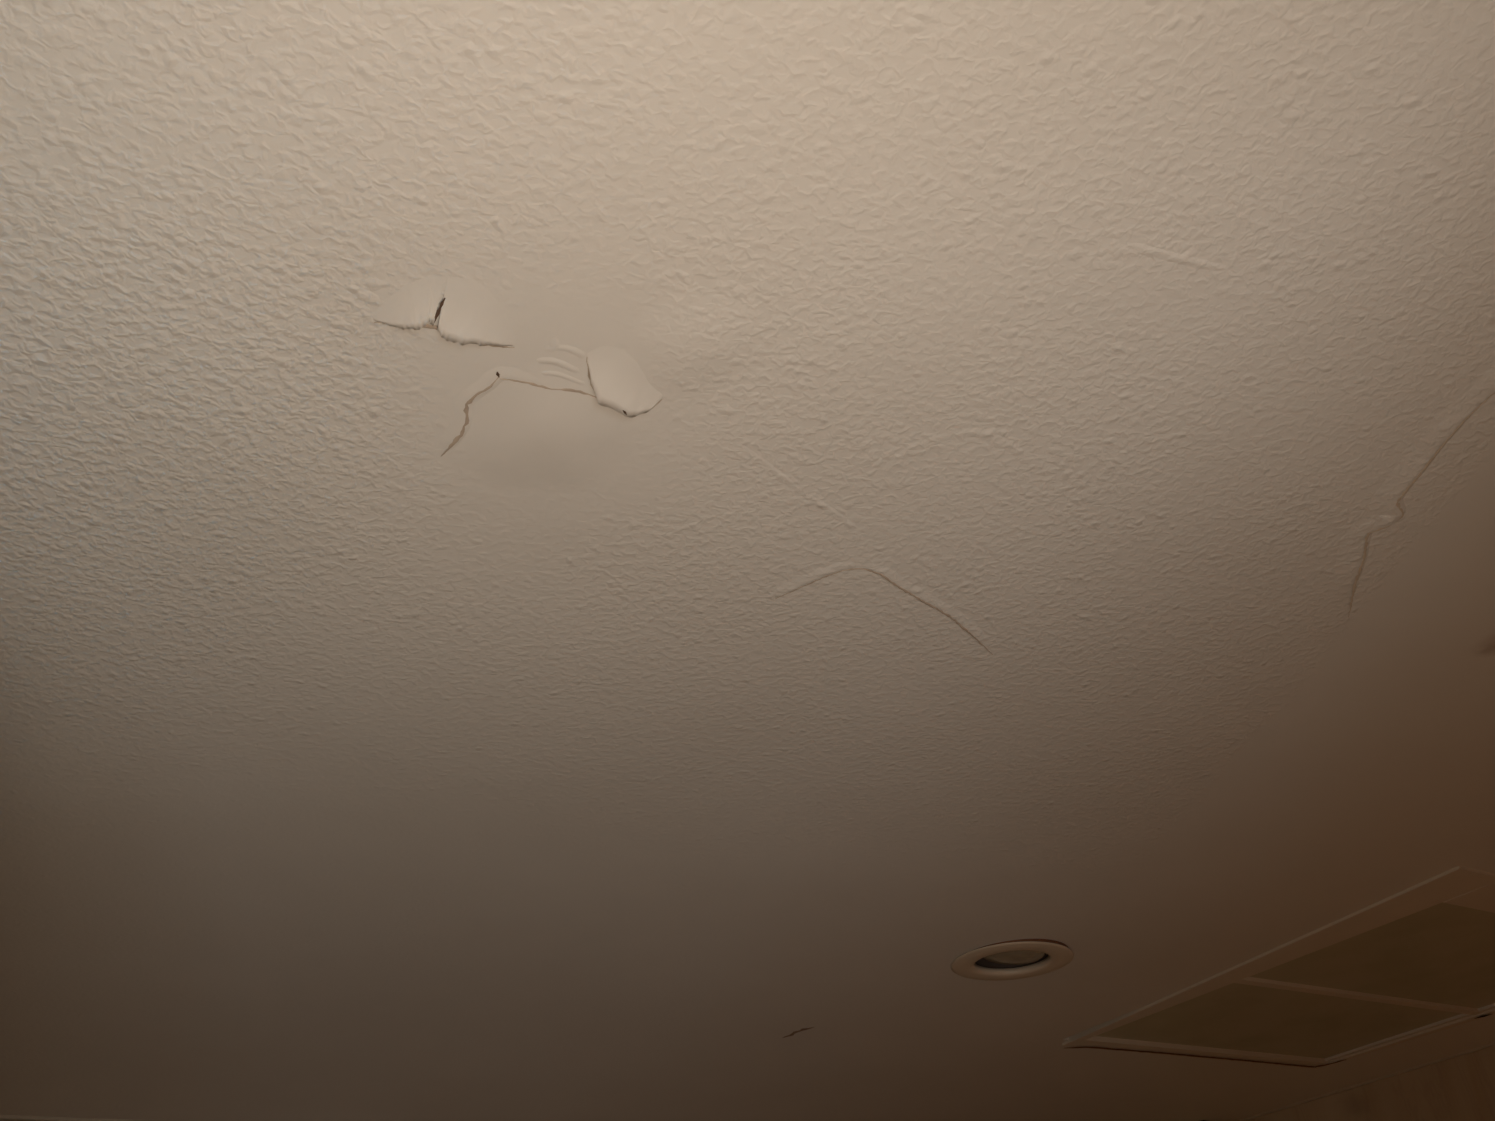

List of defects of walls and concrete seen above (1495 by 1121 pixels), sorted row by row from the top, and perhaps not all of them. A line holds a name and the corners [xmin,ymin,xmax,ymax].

peeling [372,274,516,348]
crack [439,367,595,456]
peeling [586,346,663,418]